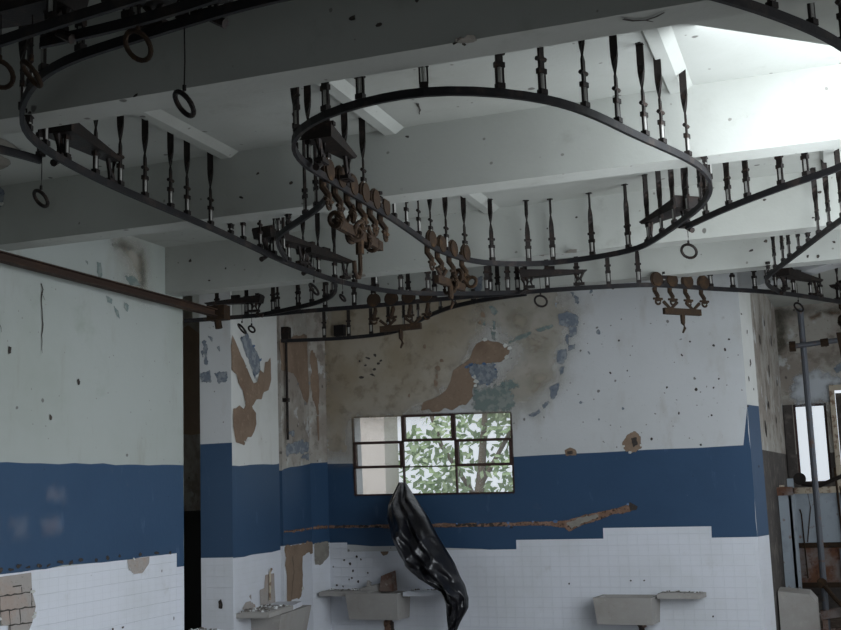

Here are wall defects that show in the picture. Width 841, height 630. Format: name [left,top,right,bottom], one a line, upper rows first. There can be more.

flaking render [421,303,579,417]
flaking render [200,331,319,460]
spalling [621,431,653,454]
peeling [0,558,83,630]
peeling [95,551,159,574]
peeling [243,568,275,610]
flaking render [285,540,330,601]